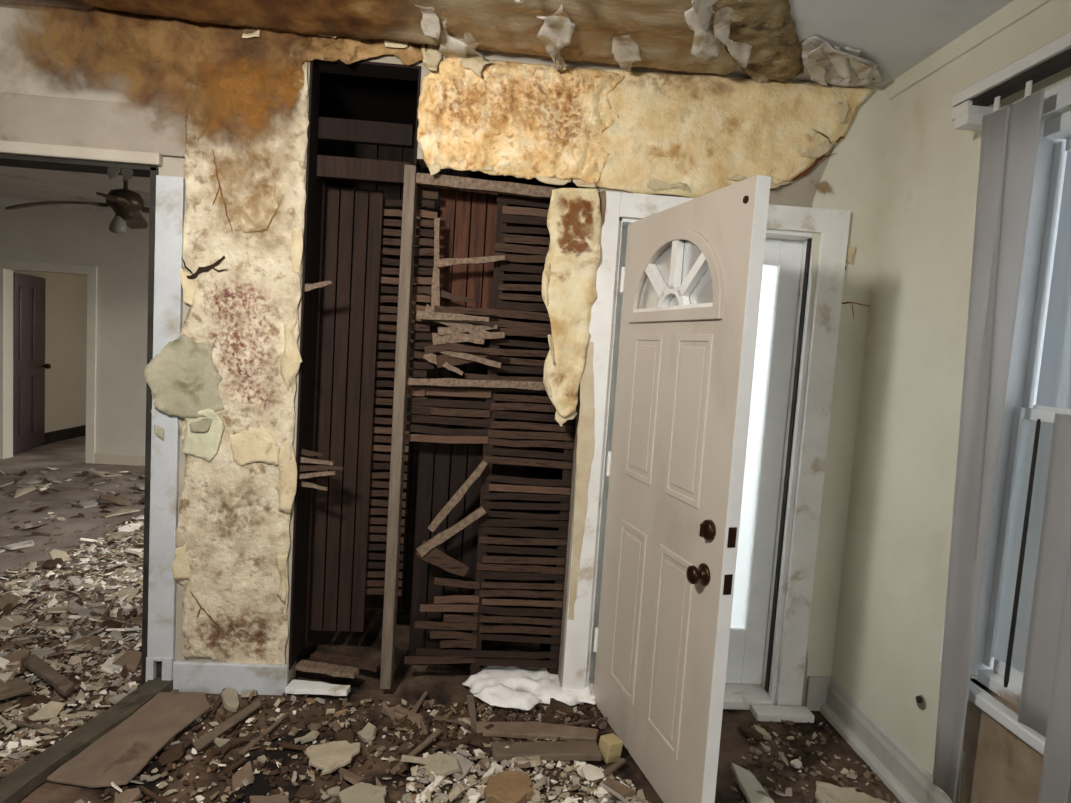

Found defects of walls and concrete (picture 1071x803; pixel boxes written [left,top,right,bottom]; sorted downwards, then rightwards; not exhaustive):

crack [182,256,228,279]
leakage [0,0,423,230]
crack [212,149,232,230]
peeling [171,61,309,665]
leakage [212,288,273,407]
peeling [379,0,884,620]